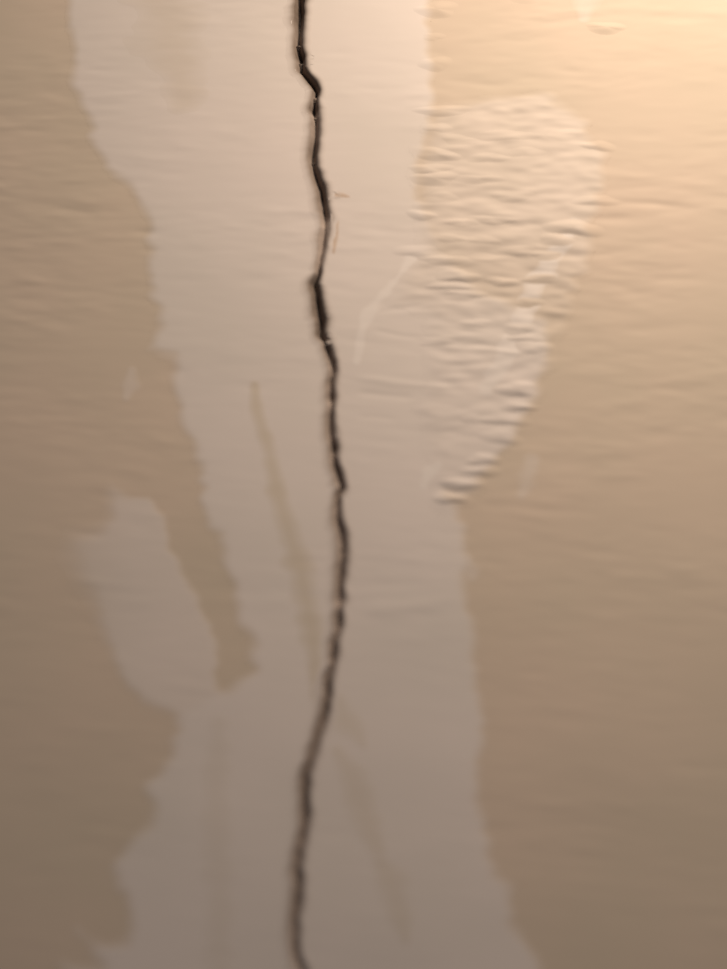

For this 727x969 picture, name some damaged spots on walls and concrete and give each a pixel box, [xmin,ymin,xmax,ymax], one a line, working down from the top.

crack [280,0,357,969]